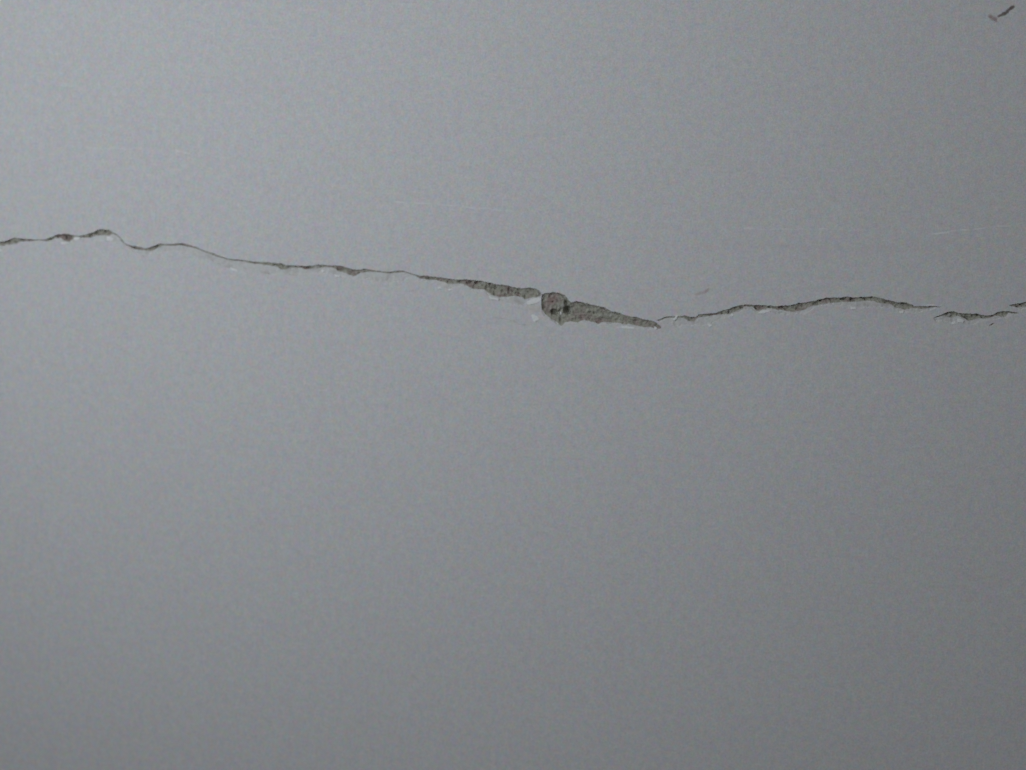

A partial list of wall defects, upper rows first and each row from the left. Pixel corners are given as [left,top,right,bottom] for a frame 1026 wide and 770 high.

crack [0,229,541,305]
crack [657,296,1026,328]